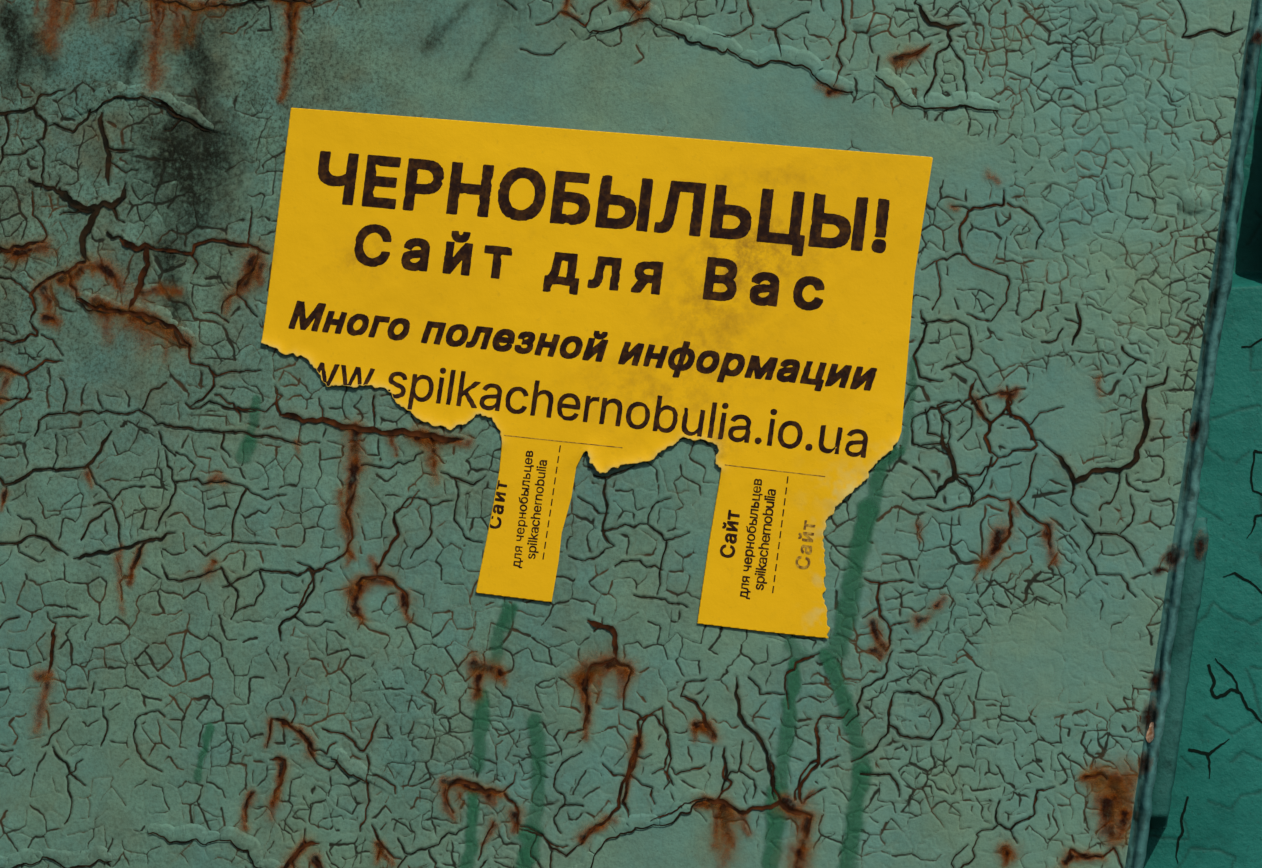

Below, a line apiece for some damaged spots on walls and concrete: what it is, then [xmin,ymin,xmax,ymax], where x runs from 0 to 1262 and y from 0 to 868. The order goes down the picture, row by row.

corrosion [274,0,310,101]
crack [713,0,846,87]
crack [876,0,968,101]
crack [0,89,485,641]
crack [902,190,1168,598]
corrosion [339,422,363,563]
corrosion [346,557,411,622]
crack [568,466,688,608]
corrosion [978,527,1008,570]
corrosion [469,657,506,699]
crack [245,579,965,868]
corrosion [1080,756,1149,844]